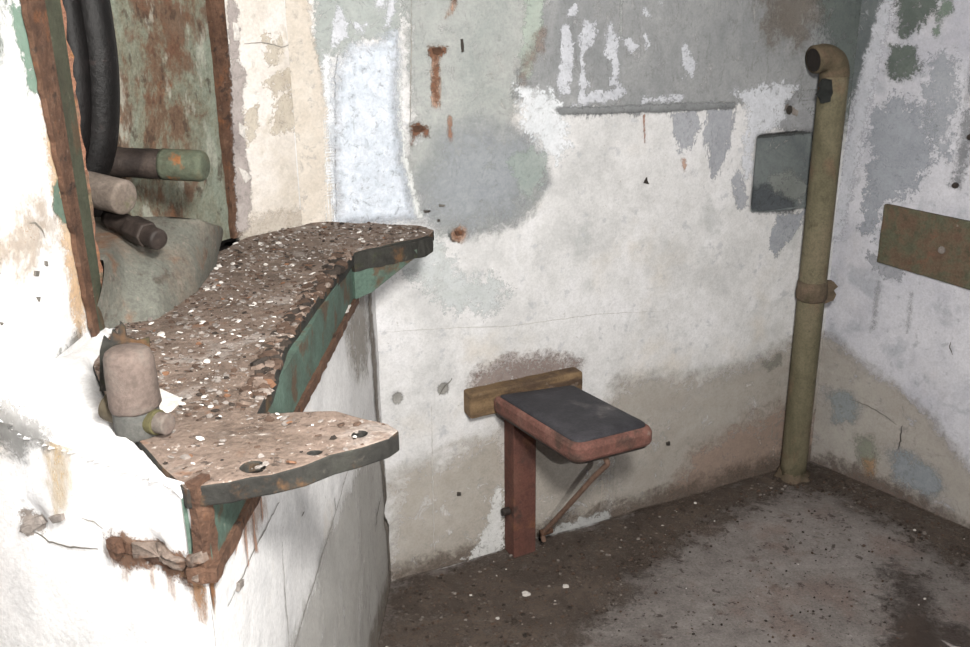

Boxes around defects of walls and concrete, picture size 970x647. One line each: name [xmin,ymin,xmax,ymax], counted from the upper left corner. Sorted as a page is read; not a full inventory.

rust [427,46,449,107]
rust [409,123,430,142]
peeling [313,0,846,320]
peeling [856,49,965,240]
rust [58,216,86,333]
rust [451,226,466,242]
peeling [865,249,906,283]
leakage [535,343,792,539]
crack [849,399,902,449]
leakage [390,437,505,578]
spalling [18,508,209,588]
rust [181,571,216,621]